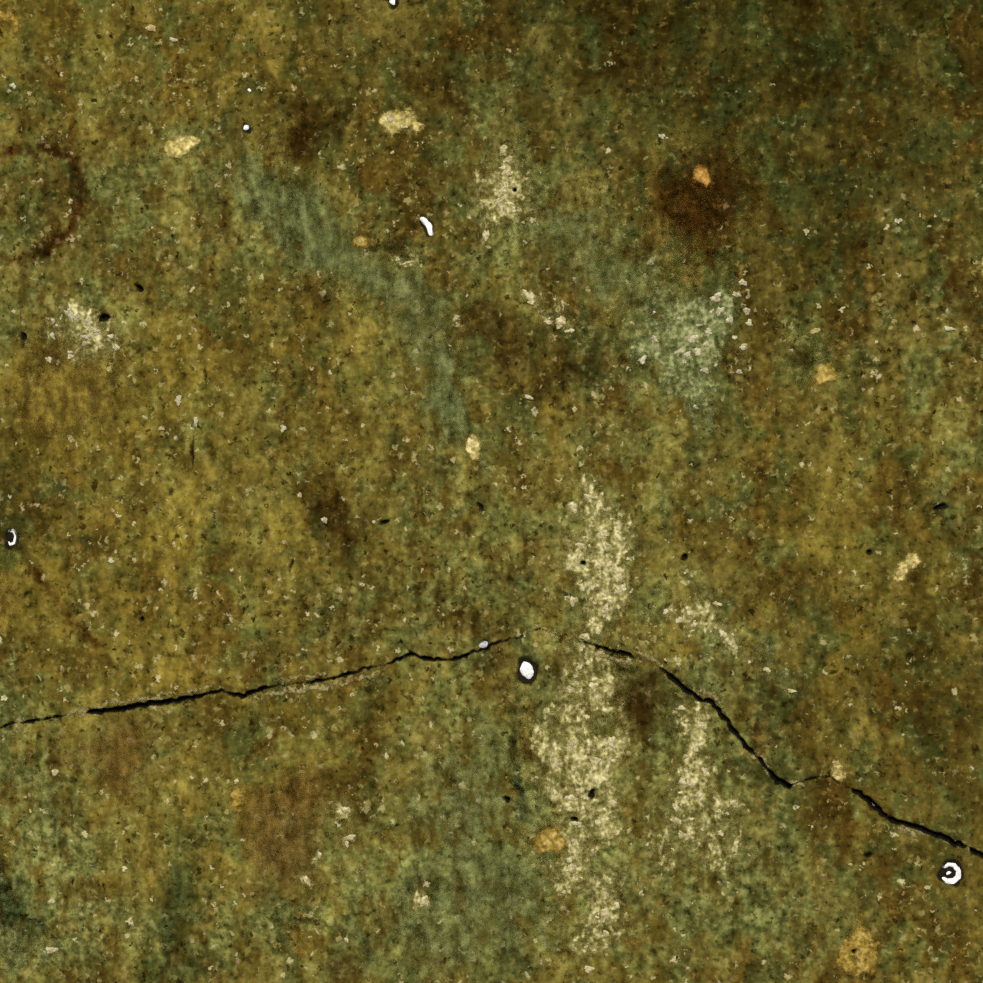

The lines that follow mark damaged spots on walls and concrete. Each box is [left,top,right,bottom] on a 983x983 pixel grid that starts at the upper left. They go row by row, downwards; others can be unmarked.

rust [693,166,710,186]
crack [0,625,983,858]